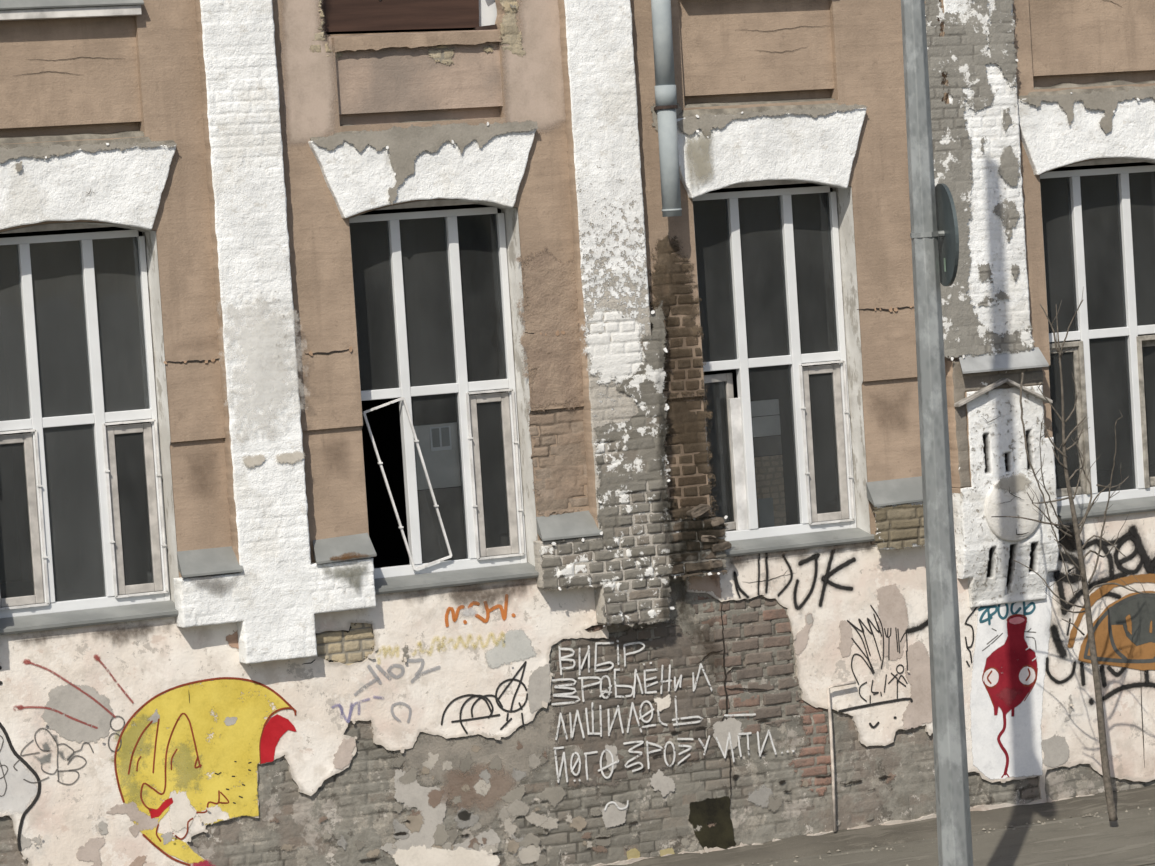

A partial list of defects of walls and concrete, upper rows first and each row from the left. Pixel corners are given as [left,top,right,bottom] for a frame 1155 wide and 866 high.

crack [13,57,125,76]
flaking render [483,0,526,57]
crack [751,25,827,53]
peeling [311,120,538,204]
peeling [924,0,1155,361]
flaking render [76,235,936,866]
peeling [41,684,113,743]
flaking render [0,815,43,866]